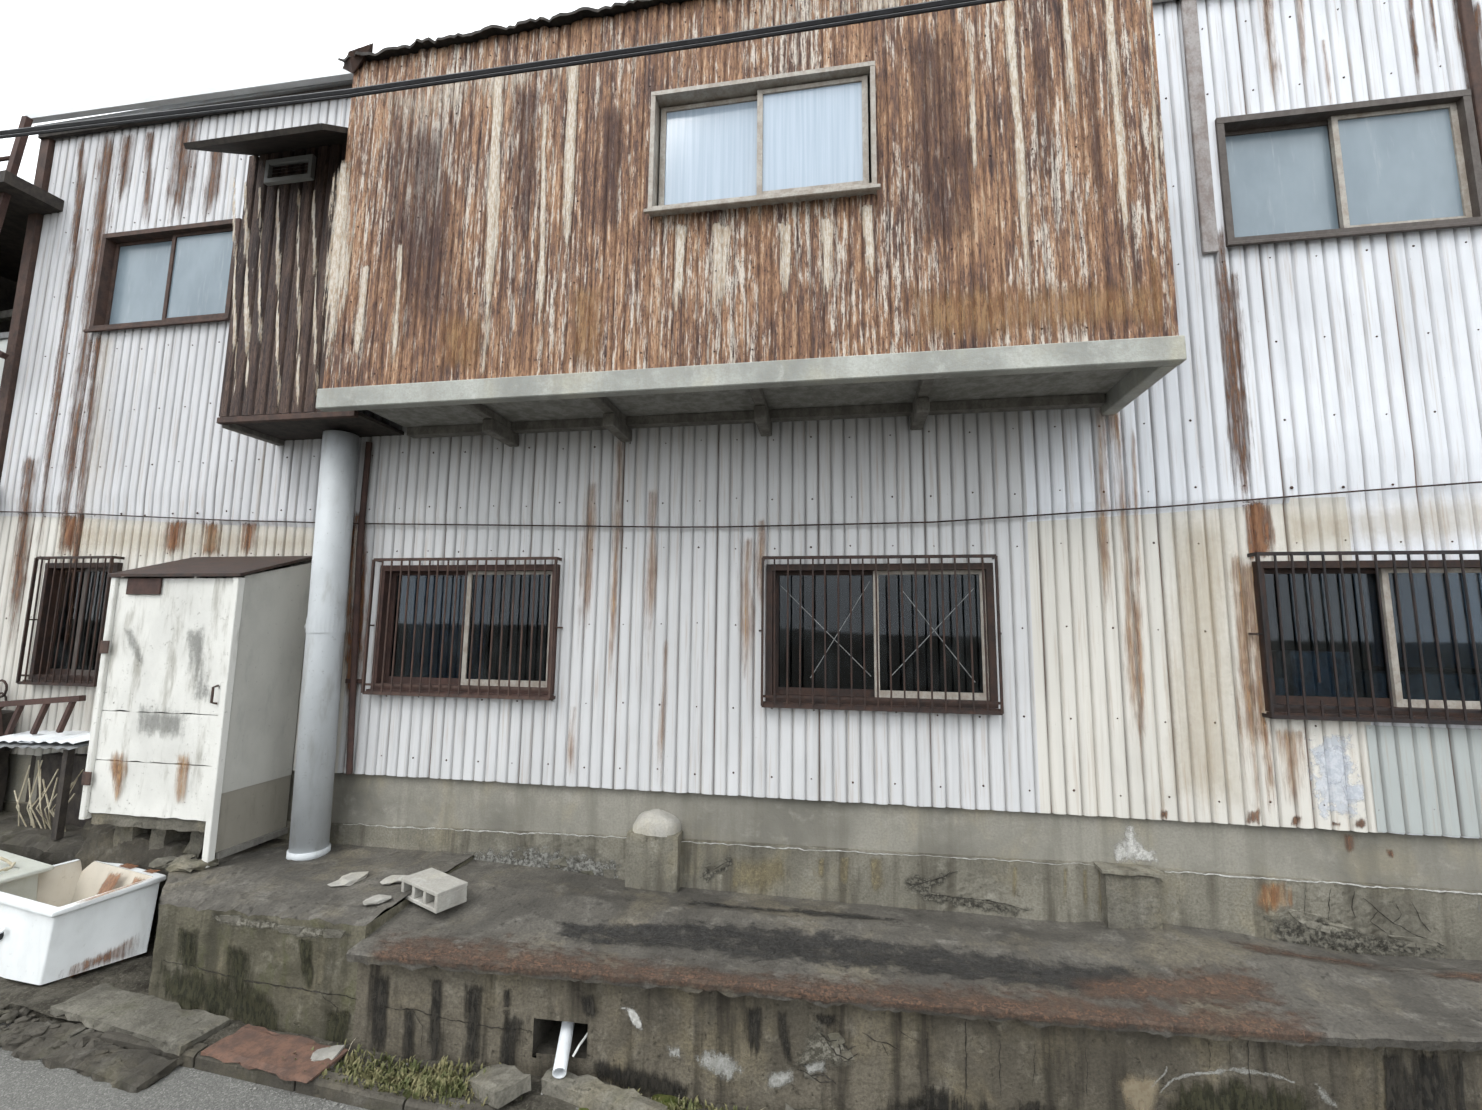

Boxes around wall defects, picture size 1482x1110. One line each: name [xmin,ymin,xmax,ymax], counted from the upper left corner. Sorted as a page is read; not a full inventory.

corrosion [392,127,479,366]
corrosion [9,120,222,638]
corrosion [1216,233,1301,795]
corrosion [1099,413,1143,729]
corrosion [112,753,127,799]
corrosion [177,757,188,800]
crack [1304,890,1444,946]
water stain [161,927,285,1032]
water stain [370,976,441,1061]
water stain [462,984,482,1064]
water stain [499,990,522,1065]
water stain [593,1060,687,1100]